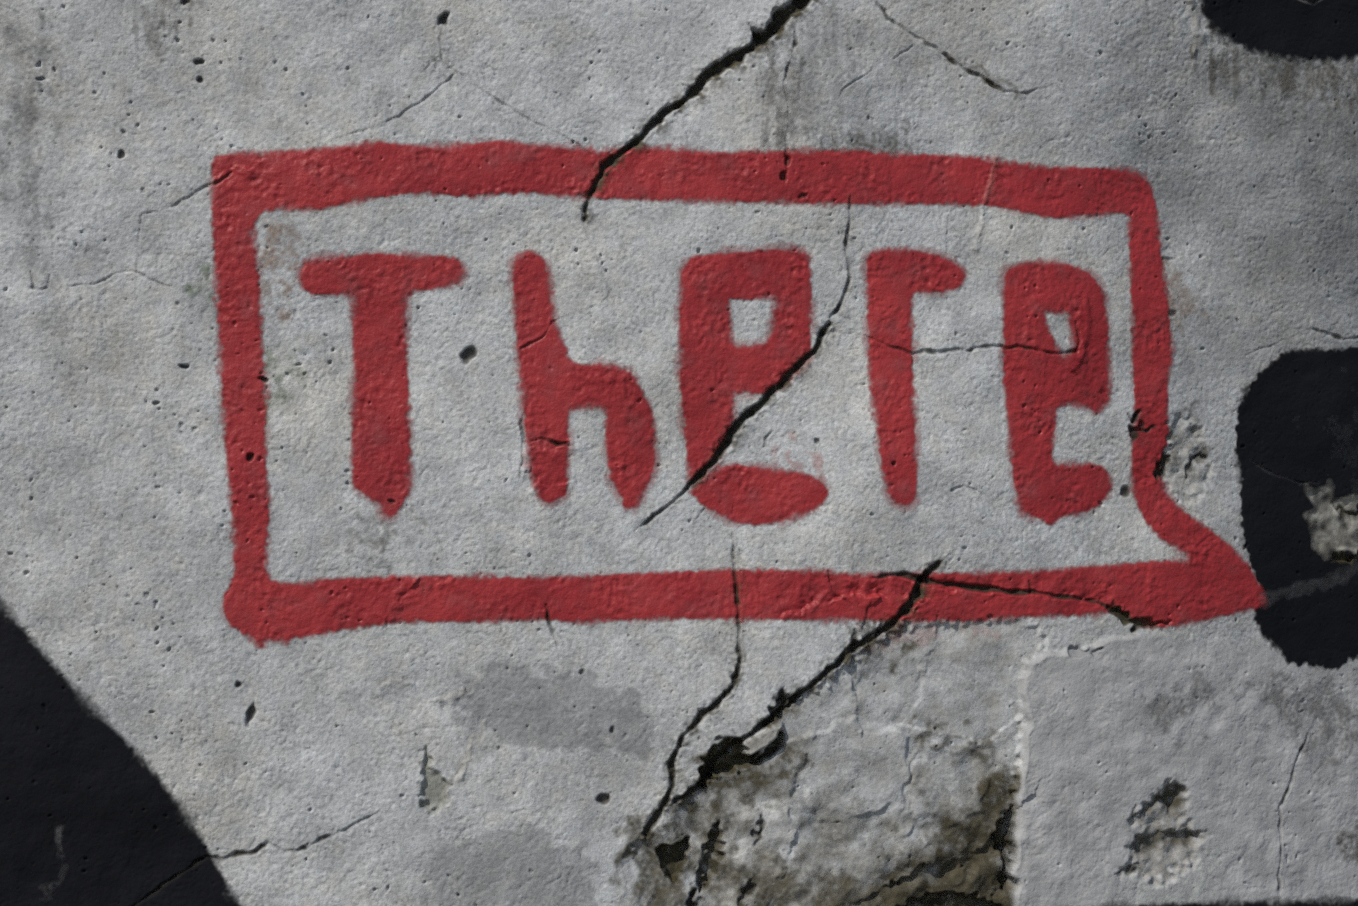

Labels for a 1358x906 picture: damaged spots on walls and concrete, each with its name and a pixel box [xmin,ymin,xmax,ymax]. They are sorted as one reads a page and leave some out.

crack [583,0,818,221]
crack [944,54,998,88]
crack [644,280,849,524]
spalling [1308,488,1358,564]
spalling [615,689,1020,906]
crack [643,561,1107,840]
spalling [1124,784,1202,880]